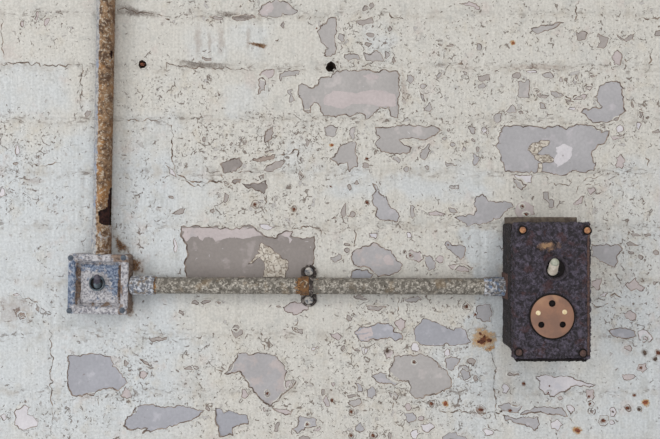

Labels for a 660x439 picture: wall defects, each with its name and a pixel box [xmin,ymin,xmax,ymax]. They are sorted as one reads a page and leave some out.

peeling [255,0,646,193]
peeling [170,206,318,278]
peeling [329,231,476,278]
peeling [426,191,515,229]
peeling [64,350,252,439]
peeling [221,349,322,439]
peeling [329,294,480,439]
corrosion [472,327,497,351]
peeling [496,371,598,434]